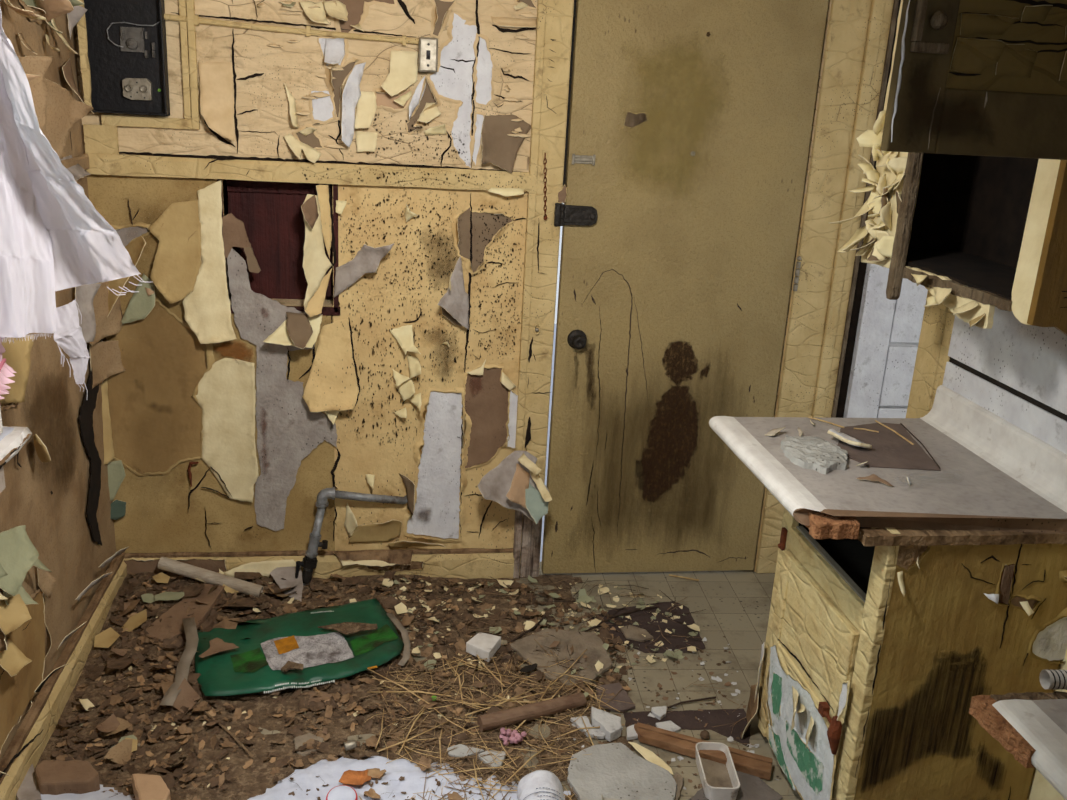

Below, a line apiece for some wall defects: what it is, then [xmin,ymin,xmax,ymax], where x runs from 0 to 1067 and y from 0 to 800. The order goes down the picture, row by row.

crack [202,31,280,175]
crack [314,120,344,160]
peeling [278,0,531,173]
crack [397,0,415,24]
peeling [830,110,907,262]
crack [957,0,1067,53]
crack [188,467,253,550]
spalling [75,179,394,546]
peeling [334,324,552,573]
water stain [604,341,713,532]
peeling [0,525,87,754]
water stain [861,649,1004,791]